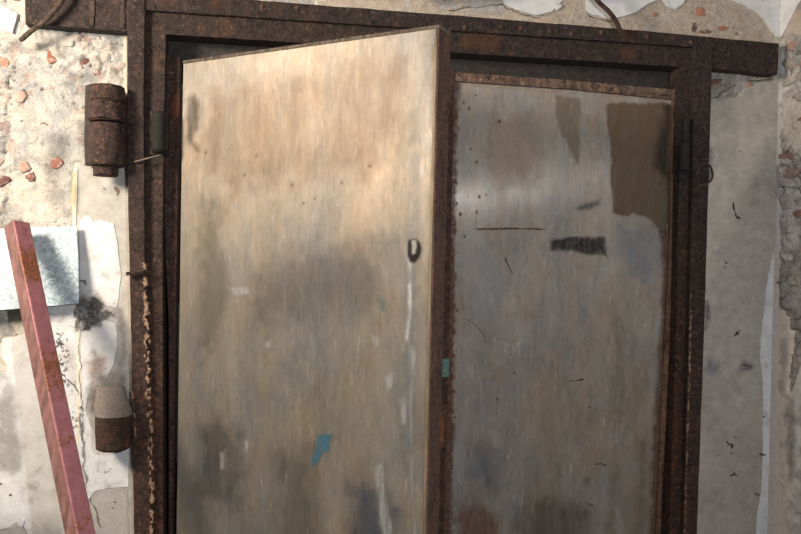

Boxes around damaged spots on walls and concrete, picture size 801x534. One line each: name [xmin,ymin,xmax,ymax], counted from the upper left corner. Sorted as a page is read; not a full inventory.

flaking render [0,308,65,534]
spalling [0,0,126,307]
flaking render [47,304,129,534]
corrosion [188,98,197,141]
corrosion [441,83,470,534]
flaking render [260,0,801,534]
corrosion [650,229,668,534]